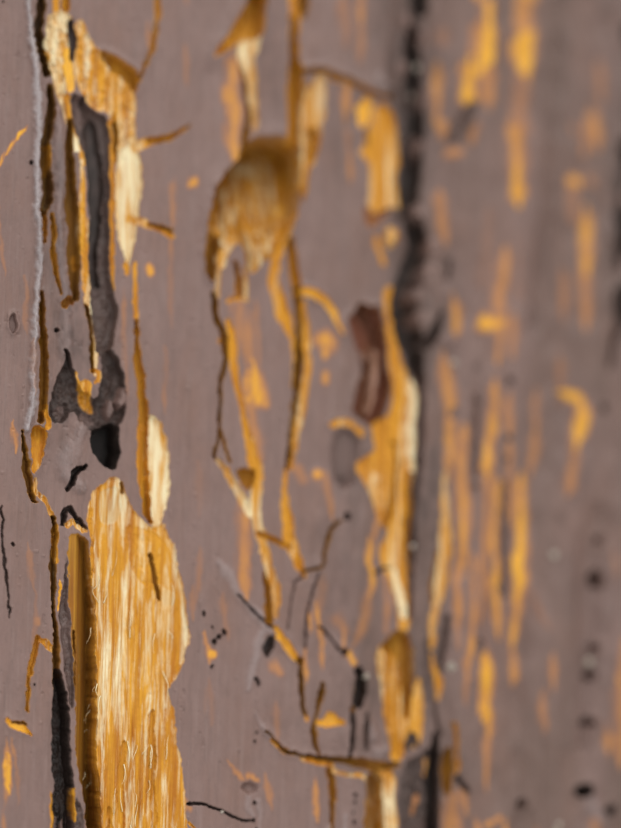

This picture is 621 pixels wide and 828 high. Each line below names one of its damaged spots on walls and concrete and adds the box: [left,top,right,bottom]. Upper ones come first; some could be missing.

crack [0,504,13,620]
peeling [20,424,56,518]
peeling [44,0,193,828]
peeling [202,0,453,828]
crack [265,518,472,828]